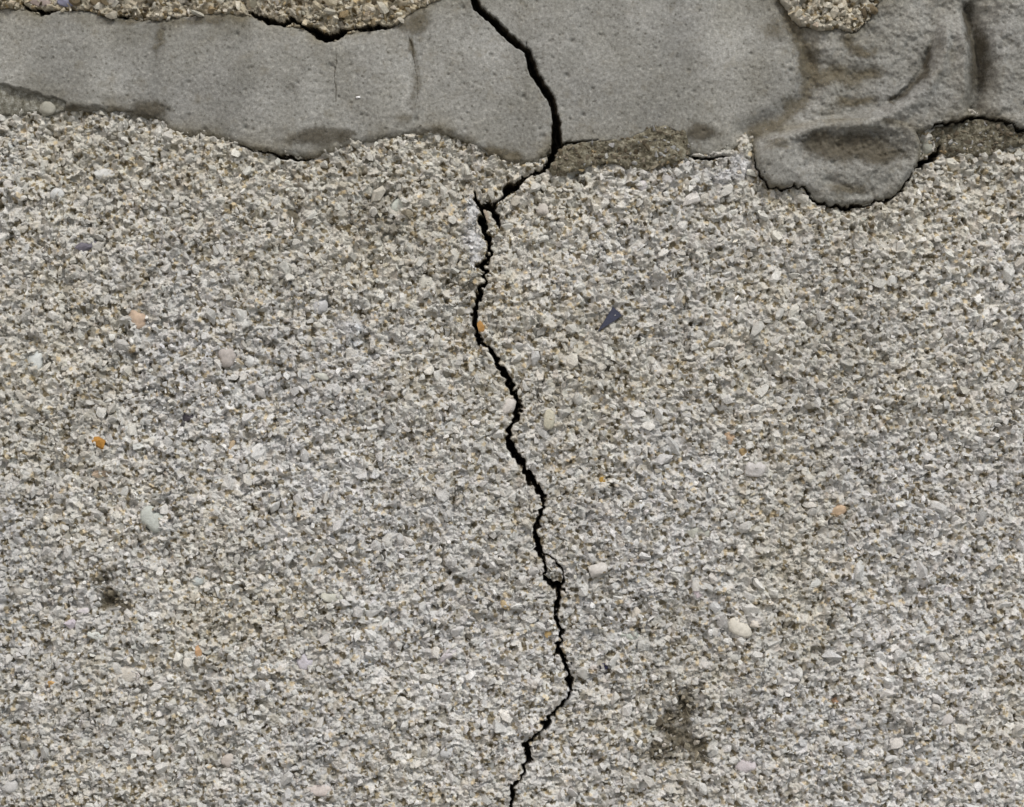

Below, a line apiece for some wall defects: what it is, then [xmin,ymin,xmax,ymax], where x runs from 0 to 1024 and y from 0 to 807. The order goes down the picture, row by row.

crack [470,0,588,807]